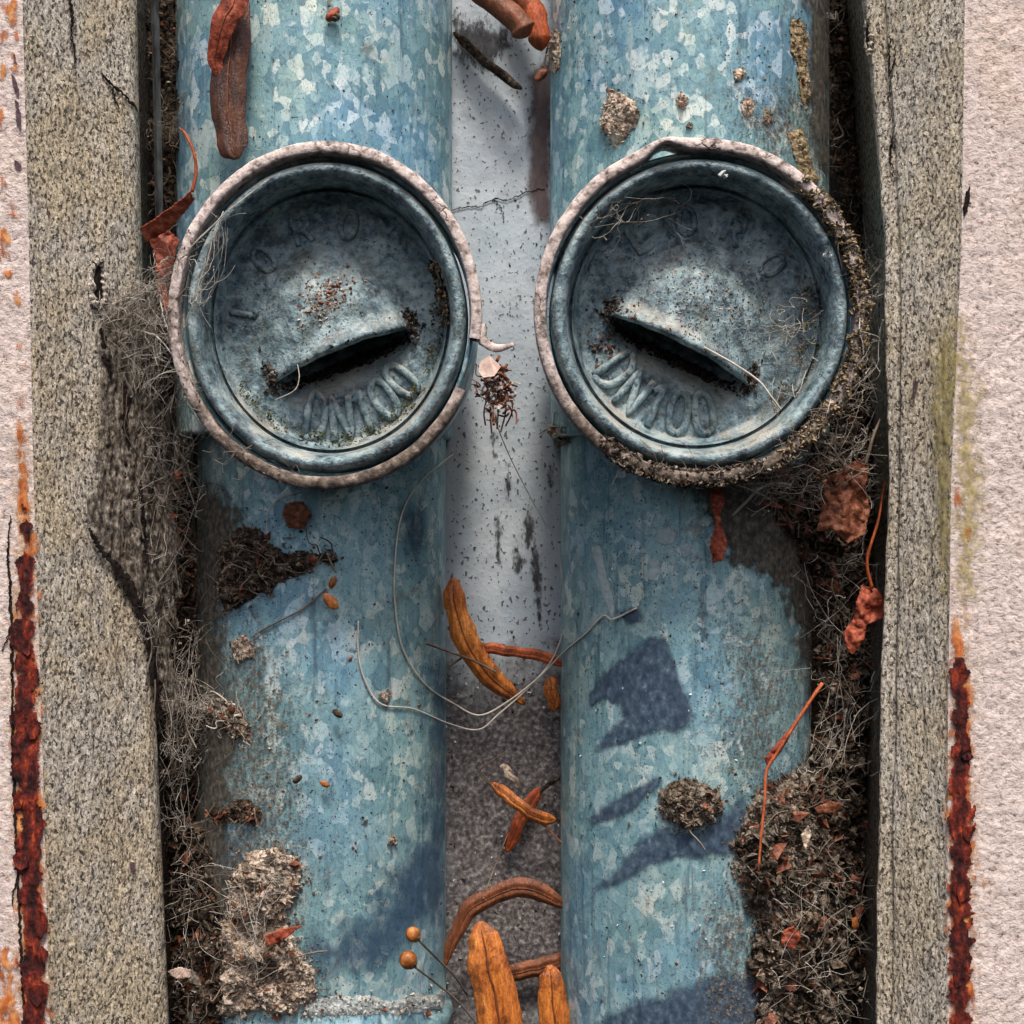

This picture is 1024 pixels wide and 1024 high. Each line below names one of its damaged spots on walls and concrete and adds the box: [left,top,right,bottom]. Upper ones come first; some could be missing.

crack [68,0,76,69]
crack [101,71,138,112]
crack [452,188,545,220]
corrosion [0,401,54,1024]
corrosion [942,613,985,1024]